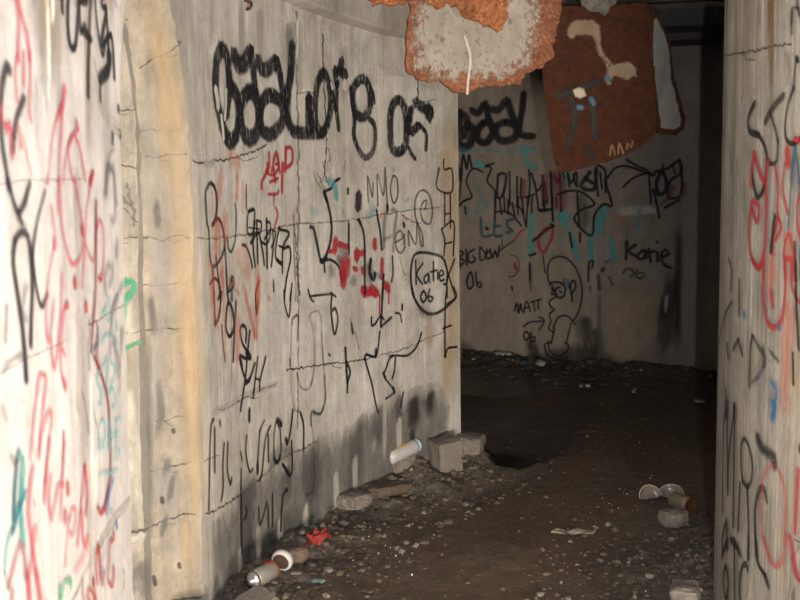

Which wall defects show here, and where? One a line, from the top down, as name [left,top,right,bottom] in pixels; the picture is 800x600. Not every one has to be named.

crack [140,42,182,69]
crack [121,144,267,169]
crack [123,234,190,244]
crack [213,11,444,428]
crack [88,296,125,378]
crack [125,327,186,335]
crack [72,441,318,600]
leakage [215,393,446,589]